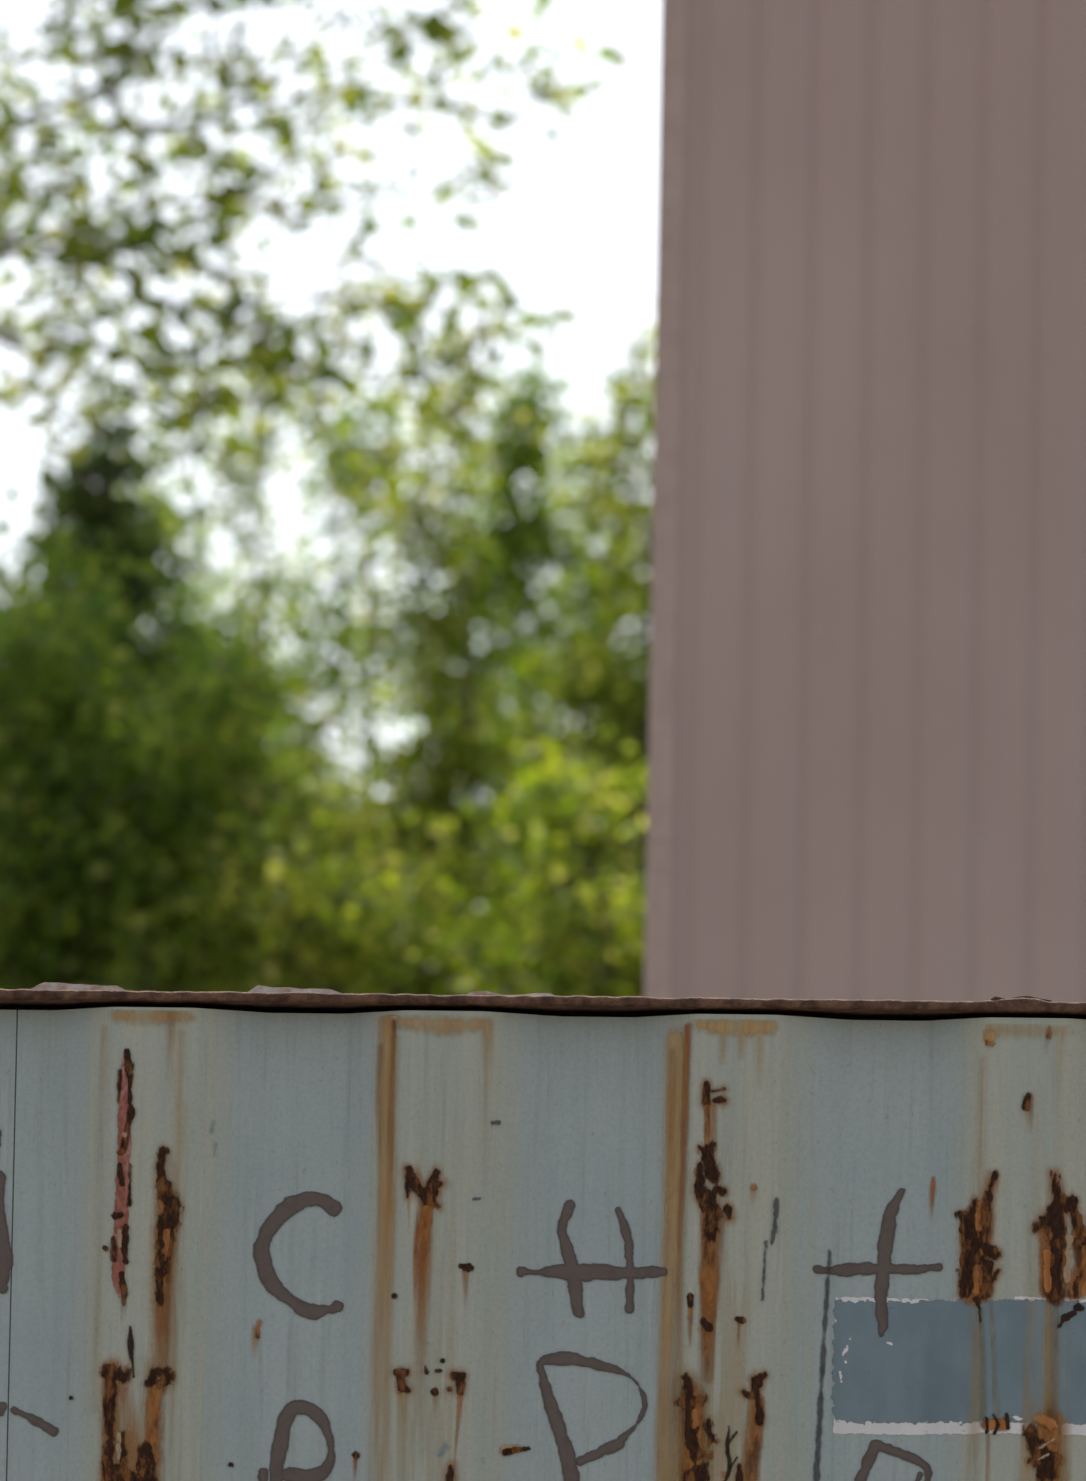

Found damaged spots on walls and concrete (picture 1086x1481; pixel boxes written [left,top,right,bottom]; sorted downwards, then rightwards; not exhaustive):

rust [101,1146,181,1481]
rust [393,1358,466,1437]
rust [377,1015,490,1346]
rust [446,1463,454,1481]
rust [657,1019,776,1481]
rust [954,1170,1001,1450]
rust [1022,1171,1086,1481]